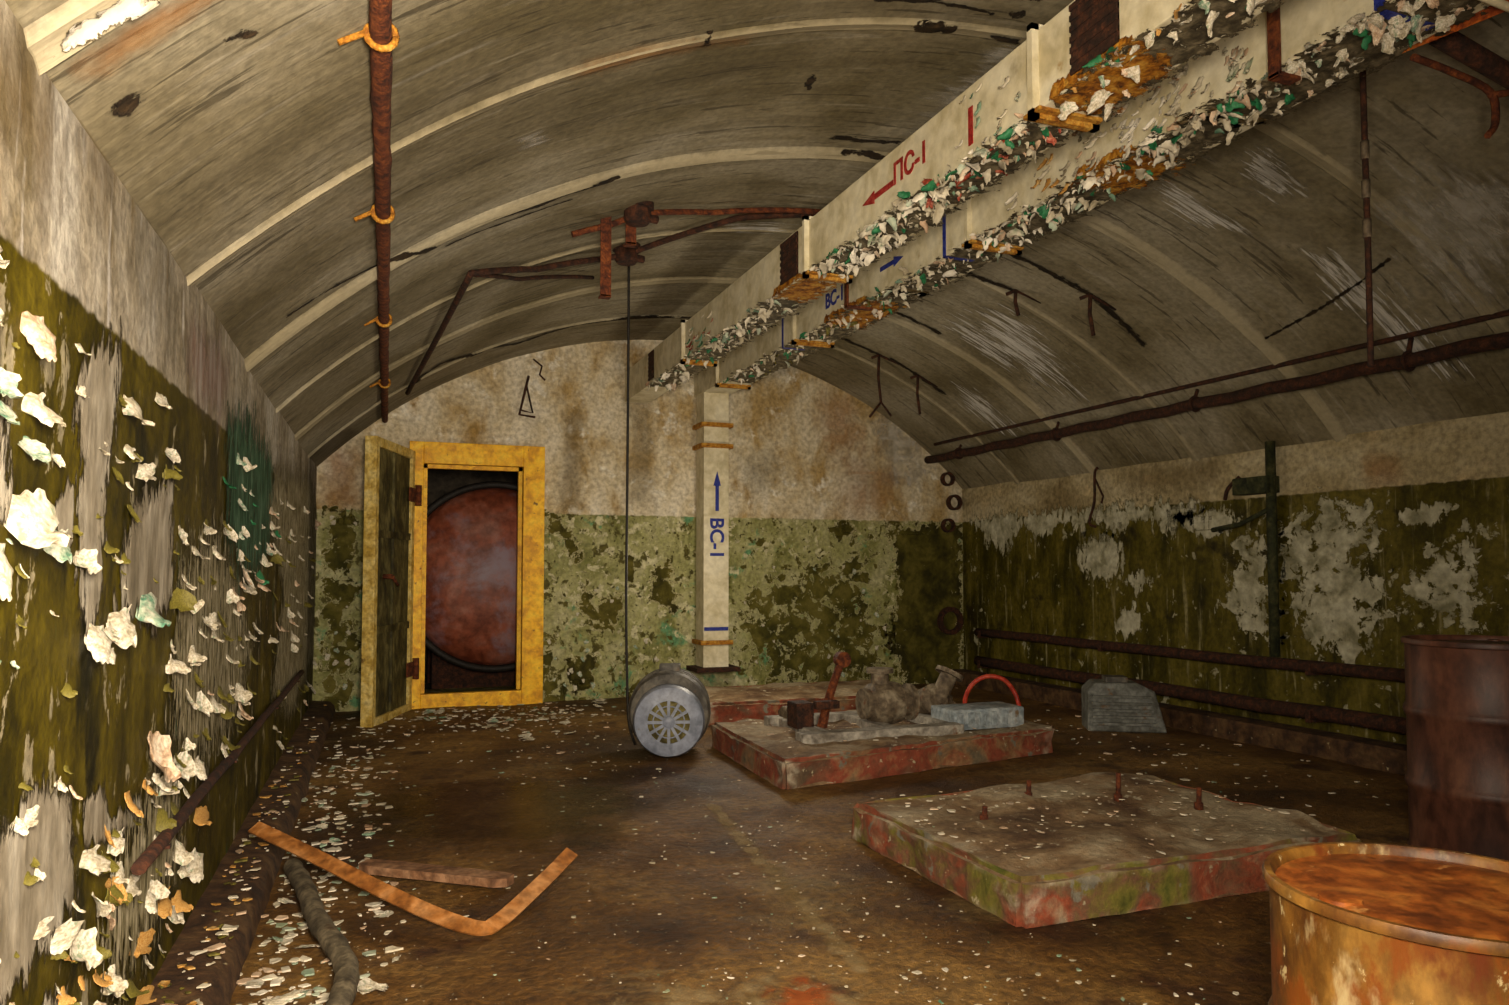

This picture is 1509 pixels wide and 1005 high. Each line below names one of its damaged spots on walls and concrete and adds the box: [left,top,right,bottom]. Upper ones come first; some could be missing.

peeling [645,297,797,391]
peeling [723,0,1472,385]
peeling [0,308,364,1005]
peeling [733,481,1494,684]